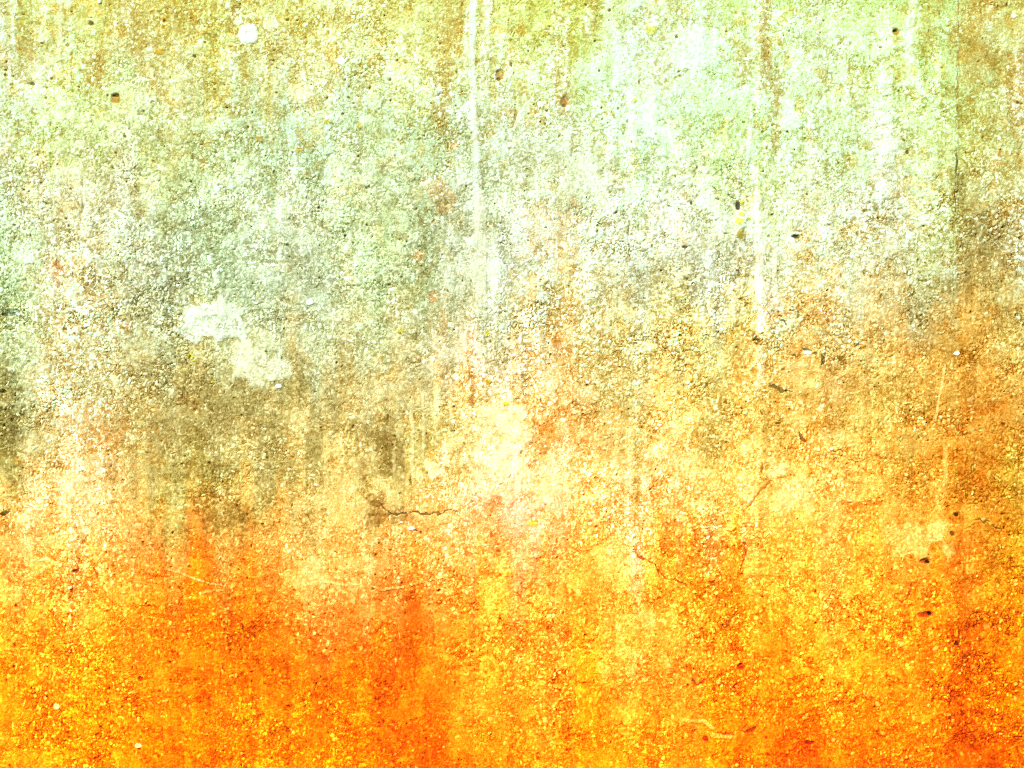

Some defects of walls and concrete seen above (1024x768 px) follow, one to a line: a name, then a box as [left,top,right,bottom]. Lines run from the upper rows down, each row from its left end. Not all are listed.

damp [55,0,455,550]
damp [462,0,504,342]
crack [379,476,458,531]